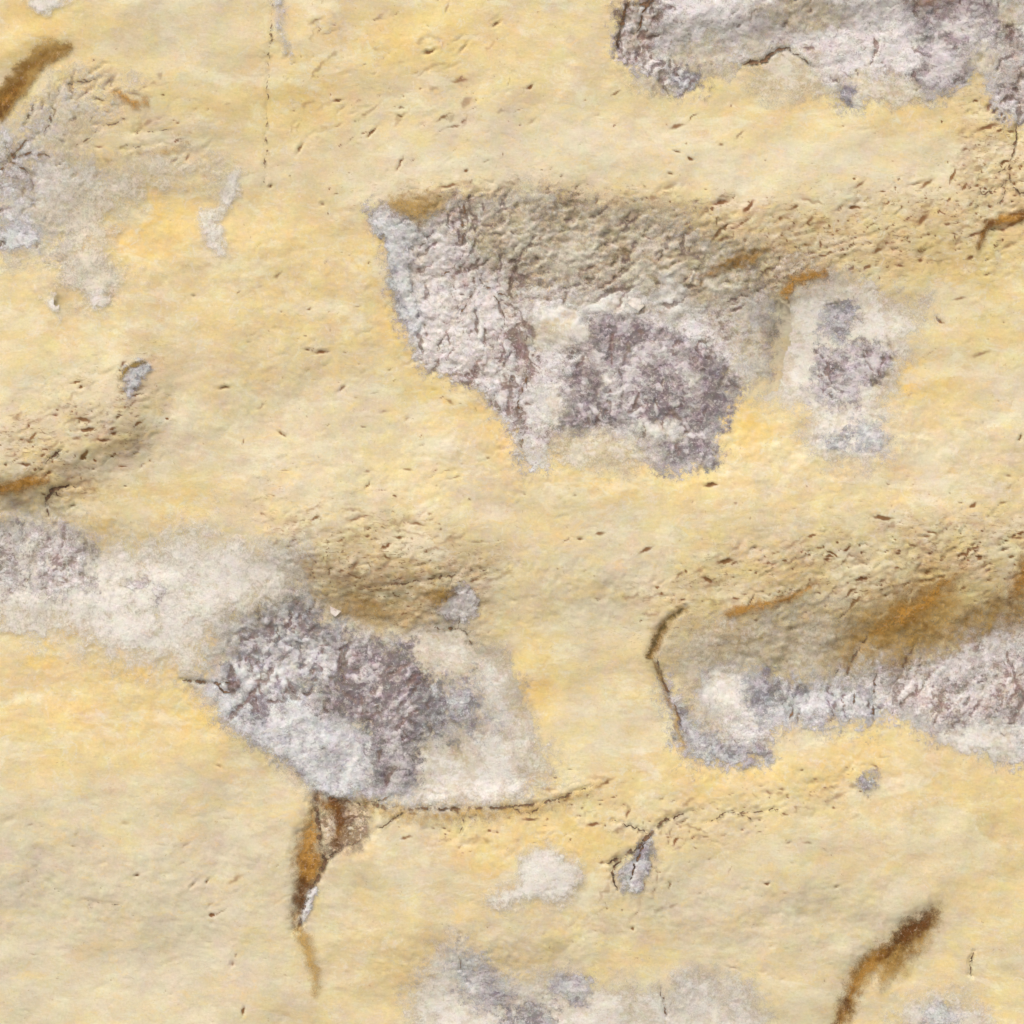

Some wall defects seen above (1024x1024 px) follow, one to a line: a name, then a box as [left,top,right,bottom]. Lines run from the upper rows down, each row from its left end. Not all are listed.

corrosion [0,38,72,121]
water stain [0,501,312,674]
crack [657,661,682,727]
corrosion [291,793,513,992]
crack [297,785,593,929]
crack [607,808,778,891]
water stain [670,968,756,1019]
corrosion [834,908,941,1024]